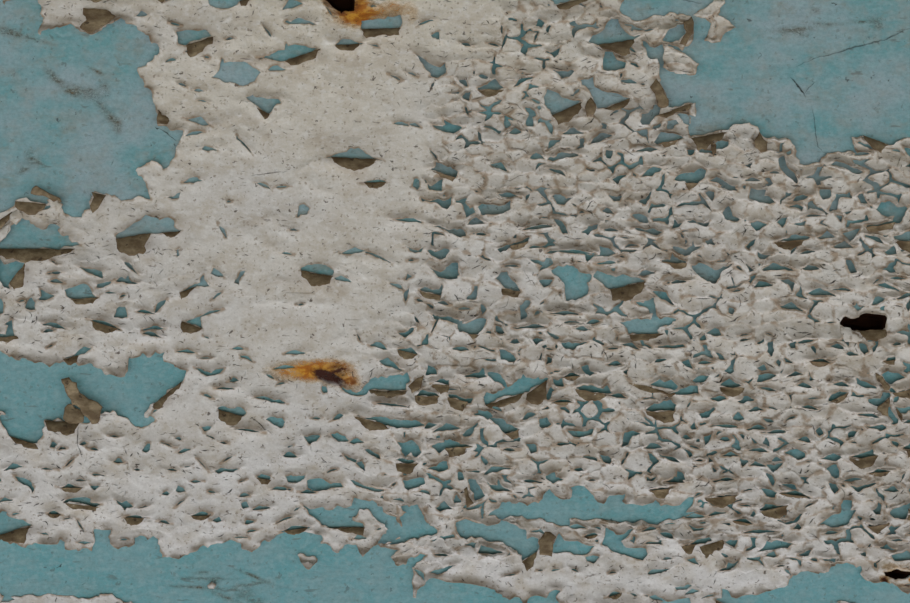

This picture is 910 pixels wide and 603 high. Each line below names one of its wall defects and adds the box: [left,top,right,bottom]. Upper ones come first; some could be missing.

rust [324,0,404,26]
spalling [405,45,451,83]
spalling [460,77,506,103]
spalling [424,116,467,138]
peeling [521,0,910,290]
peeling [0,0,410,457]
rust [279,359,360,388]
peeling [0,160,910,603]